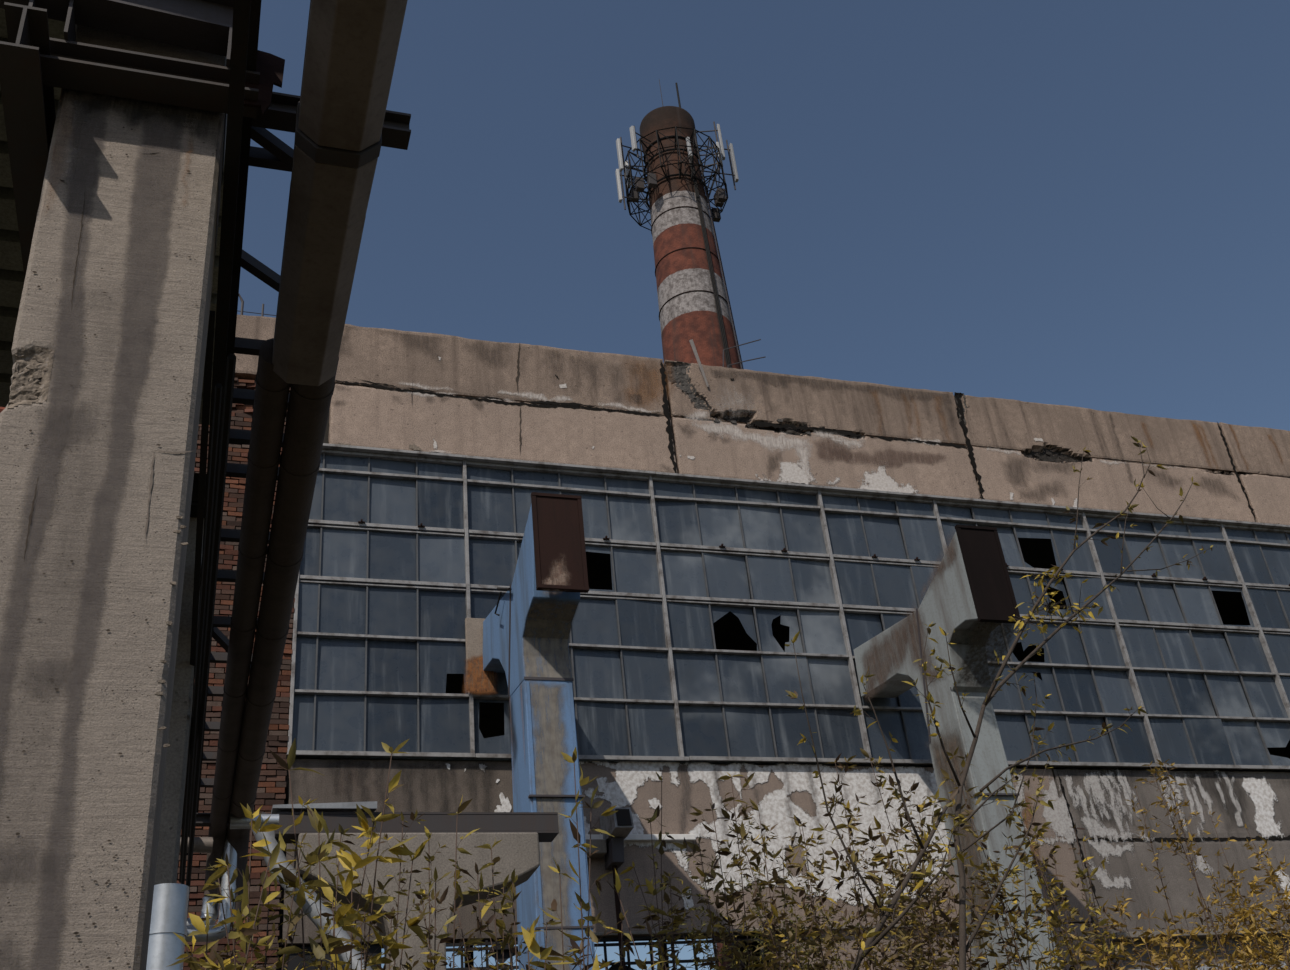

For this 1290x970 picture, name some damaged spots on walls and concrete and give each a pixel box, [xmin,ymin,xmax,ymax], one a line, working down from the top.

spalling [7,346,55,408]
crack [335,343,1014,499]
spalling [664,361,865,439]
spalling [1022,445,1092,463]
crack [1093,457,1192,468]
crack [1217,423,1290,522]
leakage [0,88,220,970]
peeling [579,761,950,910]
peeling [1014,768,1156,890]
peeling [1155,769,1285,875]
peeling [1275,870,1290,904]